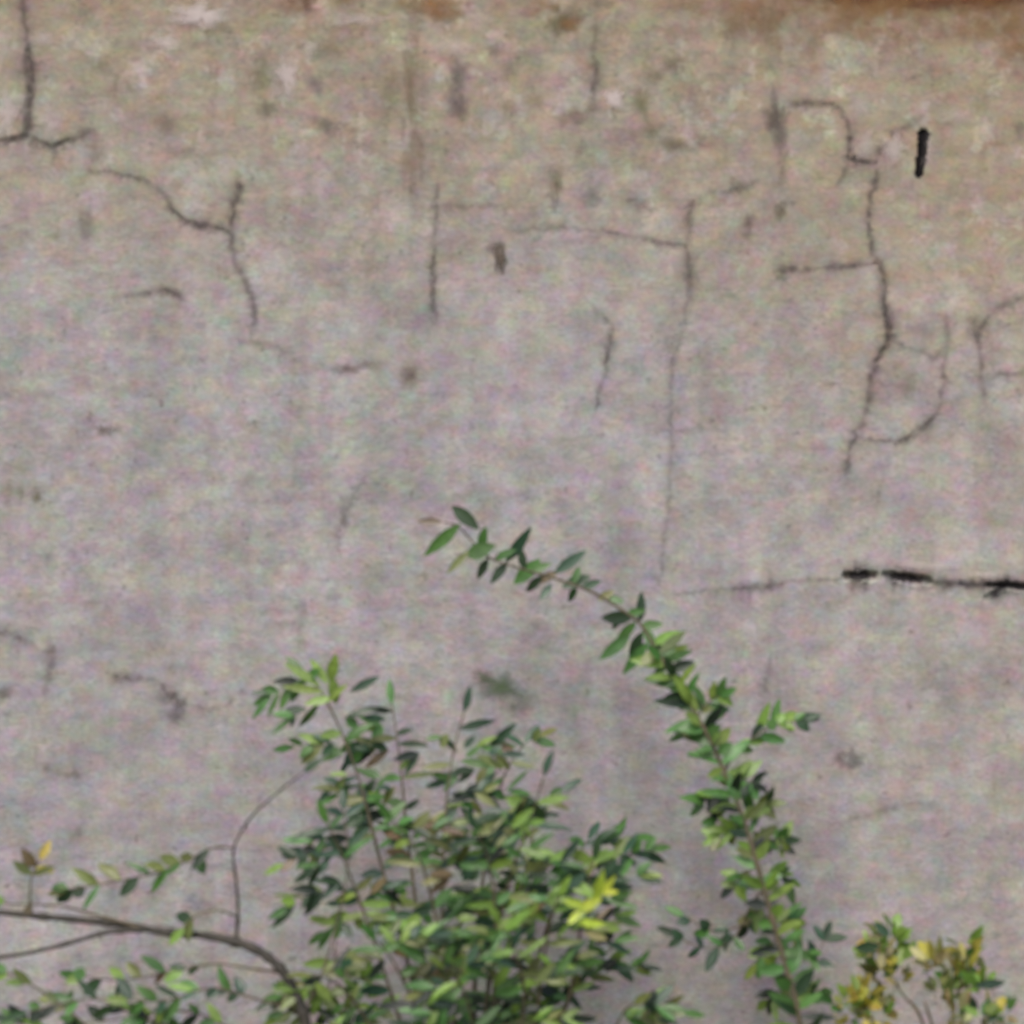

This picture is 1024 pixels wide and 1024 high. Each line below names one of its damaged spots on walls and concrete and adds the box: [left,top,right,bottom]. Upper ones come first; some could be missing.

crack [4,57,34,144]
crack [193,215,235,243]
crack [840,178,892,401]
crack [847,568,1024,598]